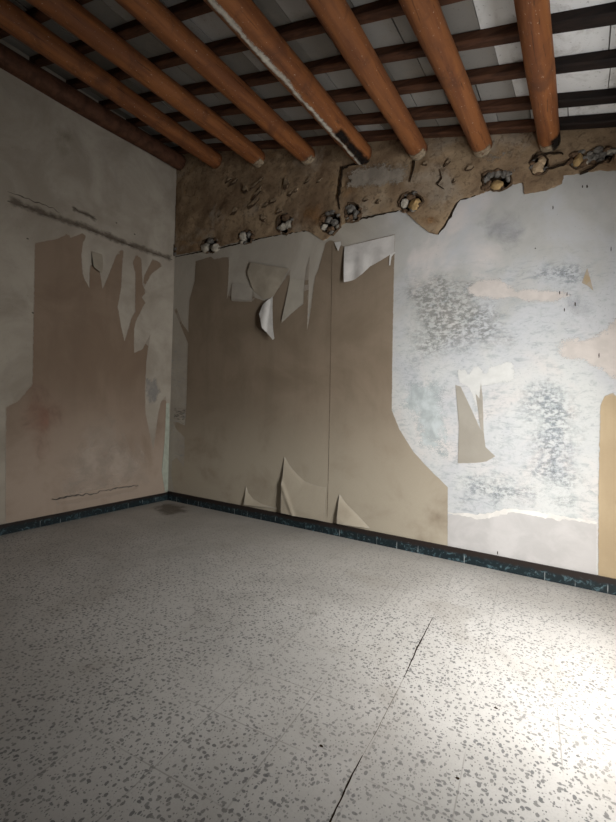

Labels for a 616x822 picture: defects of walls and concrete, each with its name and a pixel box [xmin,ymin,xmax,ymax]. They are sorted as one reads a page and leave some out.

flaking render [173,127,616,256]
water stain [401,376,451,460]
crack [329,617,432,822]